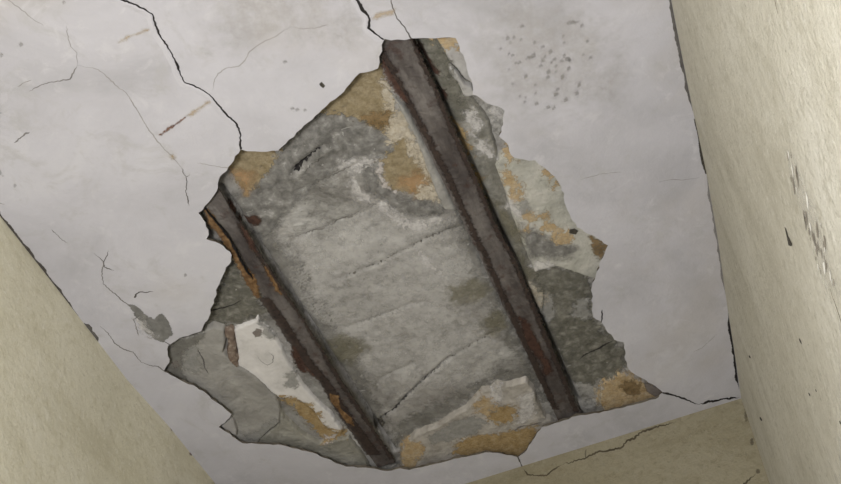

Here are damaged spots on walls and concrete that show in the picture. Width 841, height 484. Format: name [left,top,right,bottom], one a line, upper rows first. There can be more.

crack [19,26,228,204]
crack [108,0,329,150]
crack [350,0,384,42]
crack [391,1,412,39]
crack [669,0,693,111]
spalling [129,56,558,469]
spalling [413,37,661,413]
crack [662,178,725,290]
crack [663,315,739,405]
crack [517,422,673,477]